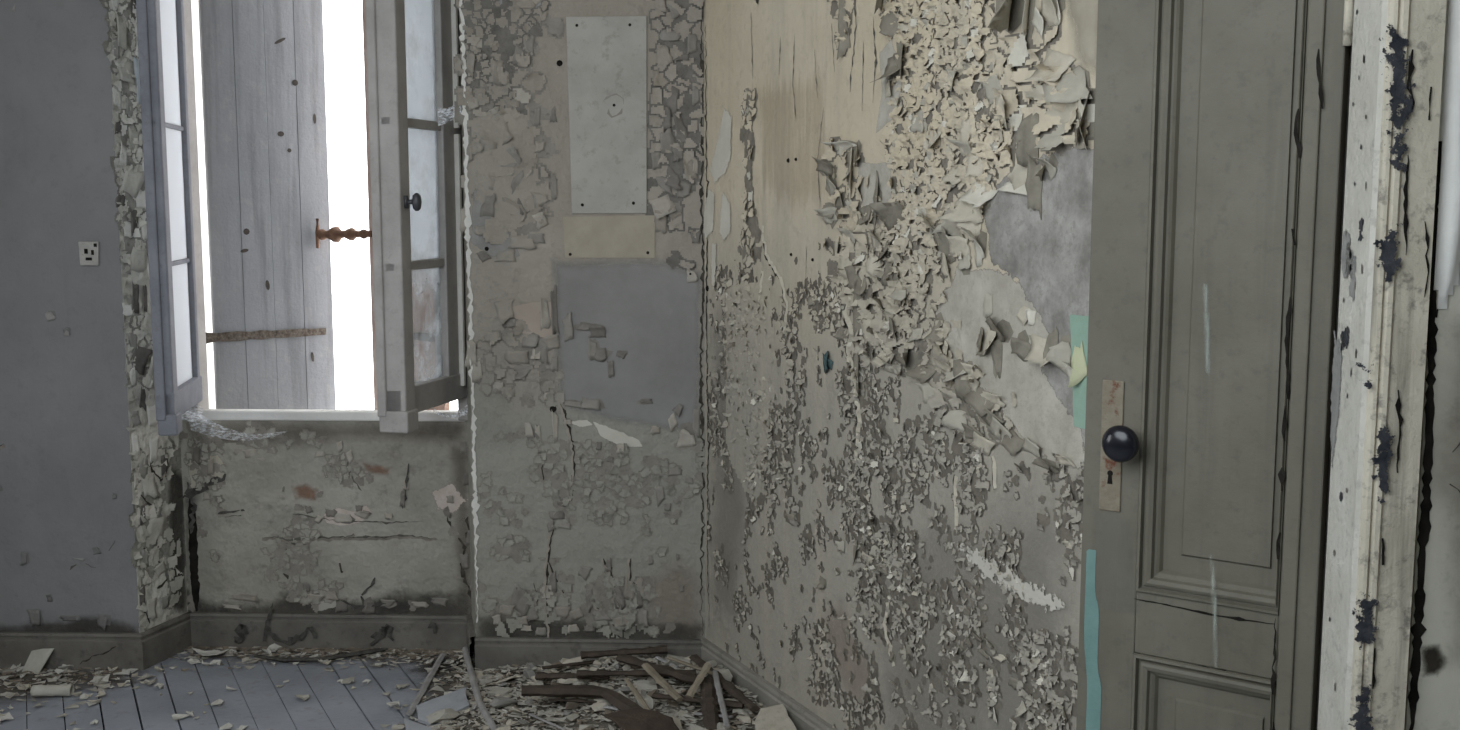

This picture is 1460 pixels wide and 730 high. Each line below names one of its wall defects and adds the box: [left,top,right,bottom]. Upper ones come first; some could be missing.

peeling [99,0,449,633]
peeling [432,0,1095,730]
spalling [1330,326,1374,467]
spalling [1370,390,1404,504]
spalling [1347,592,1380,730]